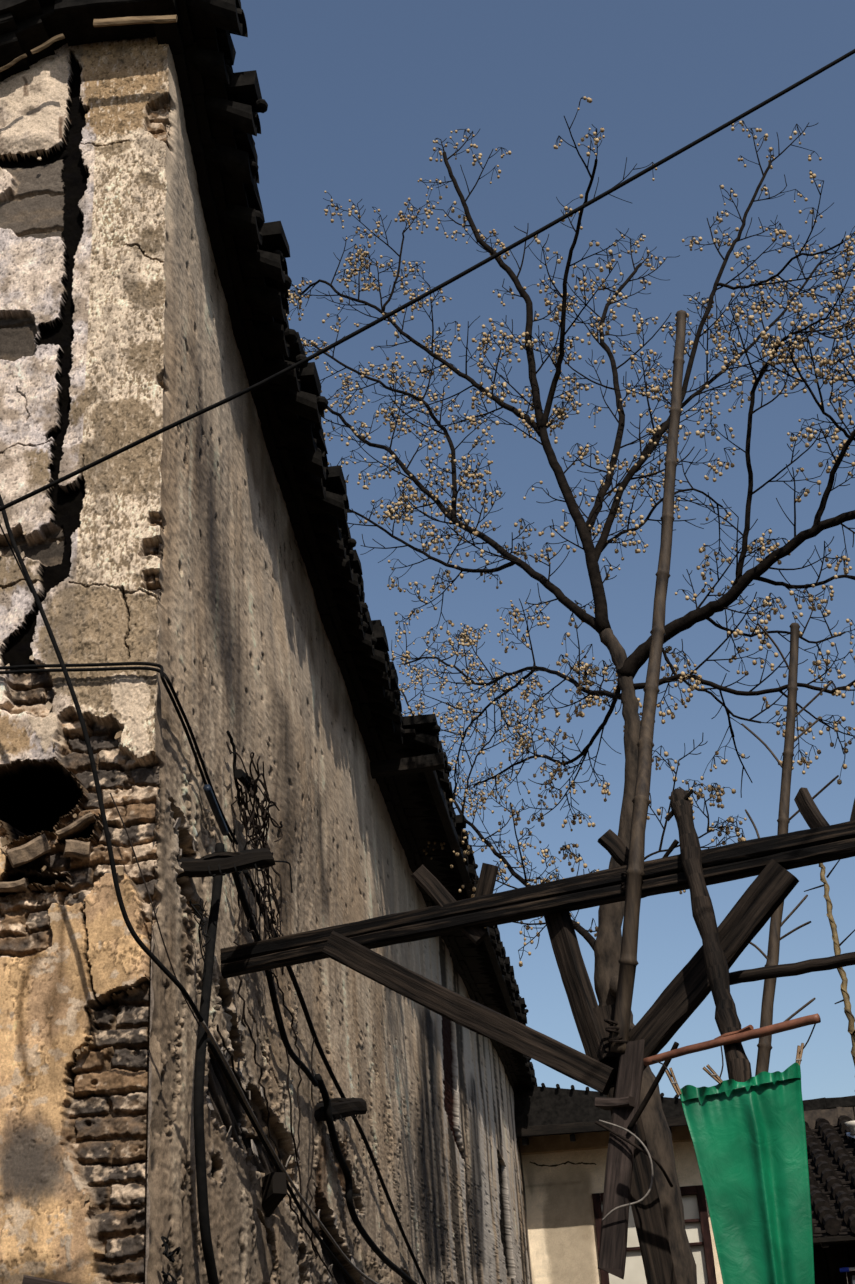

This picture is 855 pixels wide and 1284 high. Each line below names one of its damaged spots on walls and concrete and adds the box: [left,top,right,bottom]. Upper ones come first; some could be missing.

spalling [0,309,41,362]
spalling [0,157,65,241]
crack [0,50,131,674]
crack [124,243,164,263]
spalling [0,655,161,958]
leakage [3,1128,56,1195]
spalling [60,981,154,1284]
leakage [418,1008,445,1273]
leakage [468,1080,484,1268]